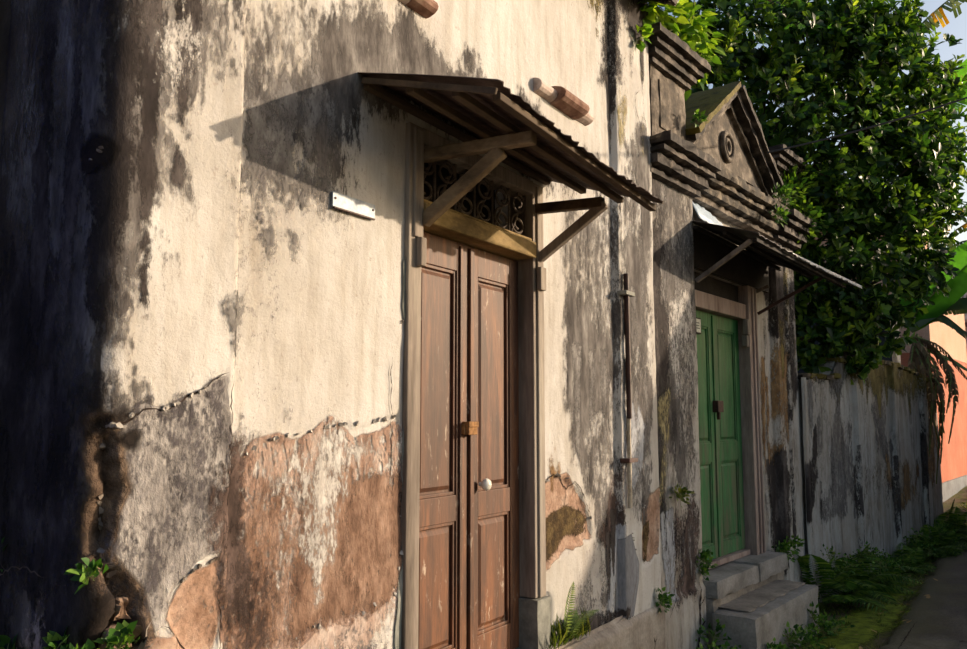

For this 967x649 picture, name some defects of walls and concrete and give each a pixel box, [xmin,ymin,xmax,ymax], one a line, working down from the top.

crack [102,372,234,649]
peeling [78,376,404,649]
water stain [0,0,487,649]
spalling [545,472,592,570]
water stain [562,0,701,639]
water stain [764,265,939,575]